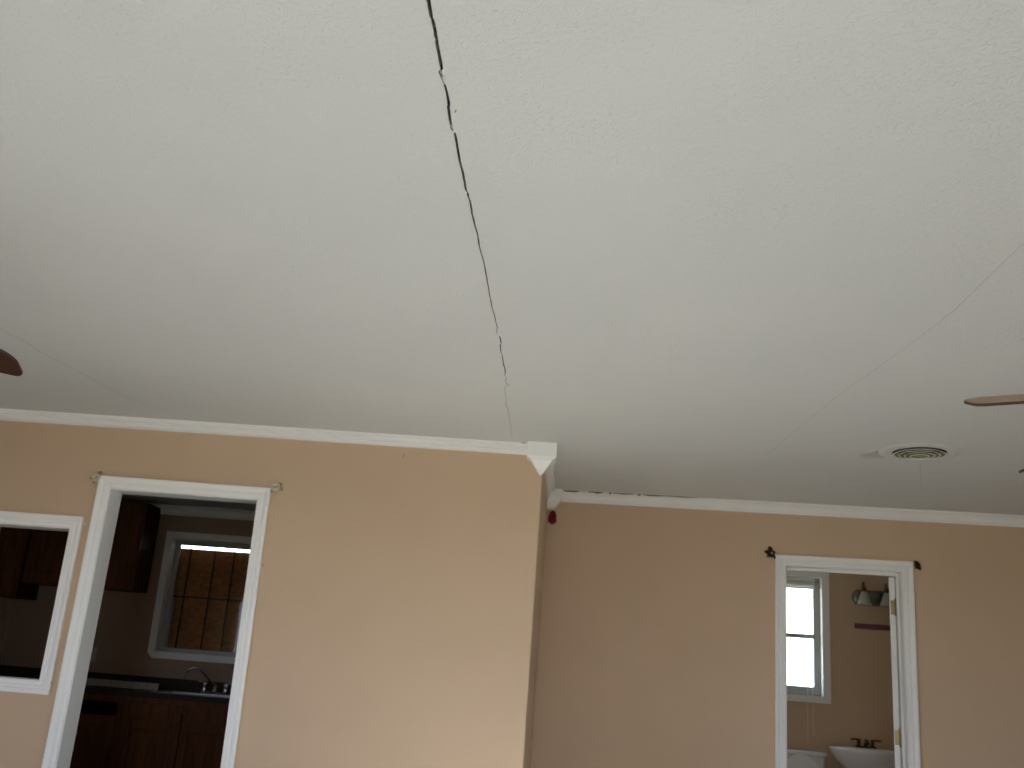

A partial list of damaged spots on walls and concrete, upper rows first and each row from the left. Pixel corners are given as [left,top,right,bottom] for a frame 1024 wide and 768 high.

crack [426,0,522,443]